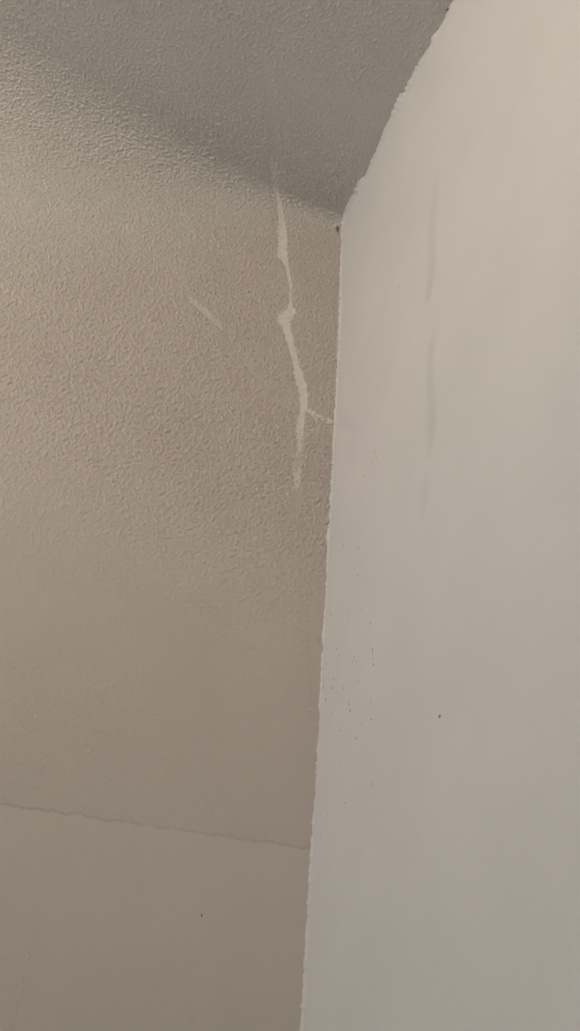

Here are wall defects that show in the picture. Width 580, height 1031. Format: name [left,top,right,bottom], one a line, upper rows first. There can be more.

crack [266,96,333,714]